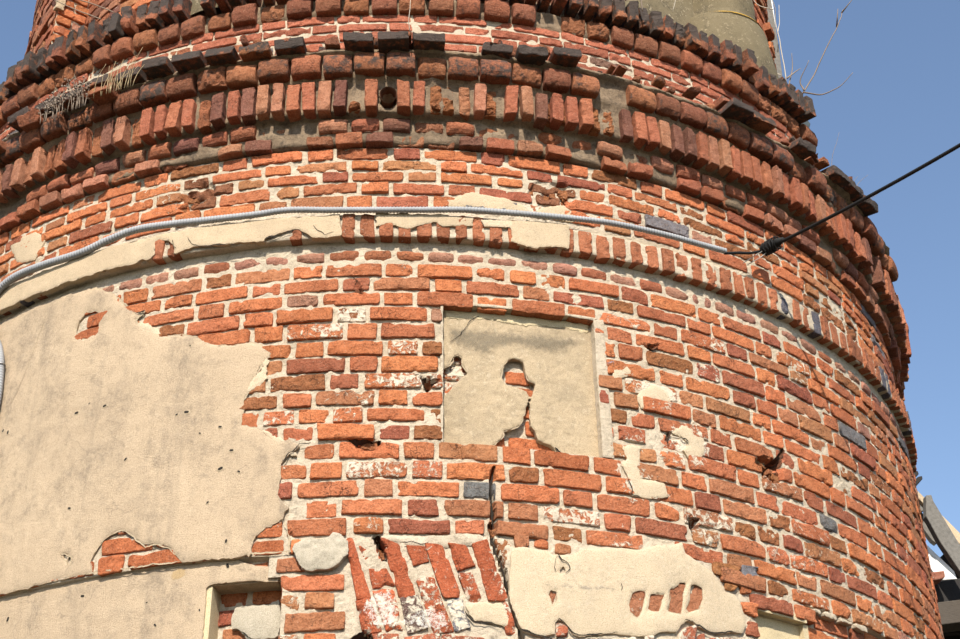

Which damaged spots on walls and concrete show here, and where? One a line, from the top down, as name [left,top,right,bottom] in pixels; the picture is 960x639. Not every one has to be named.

flaking render [53,287,285,444]
flaking render [494,359,589,484]
hole [348,439,381,451]
flaking render [245,519,291,557]
spalling [373,536,387,561]
crack [465,471,618,639]
flaking render [629,583,702,617]